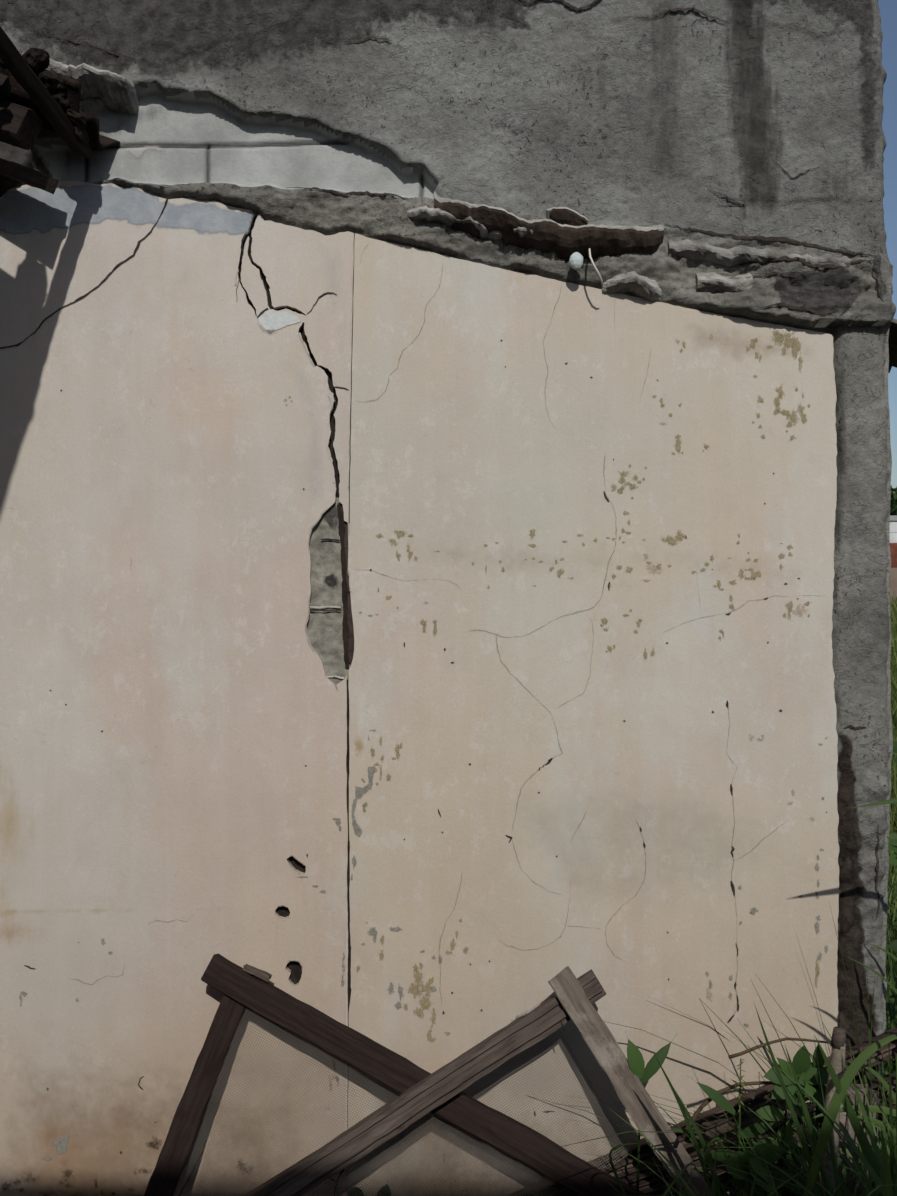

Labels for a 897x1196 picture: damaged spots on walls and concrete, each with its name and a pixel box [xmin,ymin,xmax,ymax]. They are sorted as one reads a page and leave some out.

leakage [0,0,536,76]
leakage [727,0,777,209]
leakage [804,0,881,163]
crack [0,197,168,349]
crack [287,187,413,200]
spalling [33,83,895,370]
crack [235,216,355,592]
peeling [752,387,810,440]
spalling [307,498,378,690]
peeling [562,465,647,546]
peeling [692,534,761,610]
crack [344,680,352,1027]